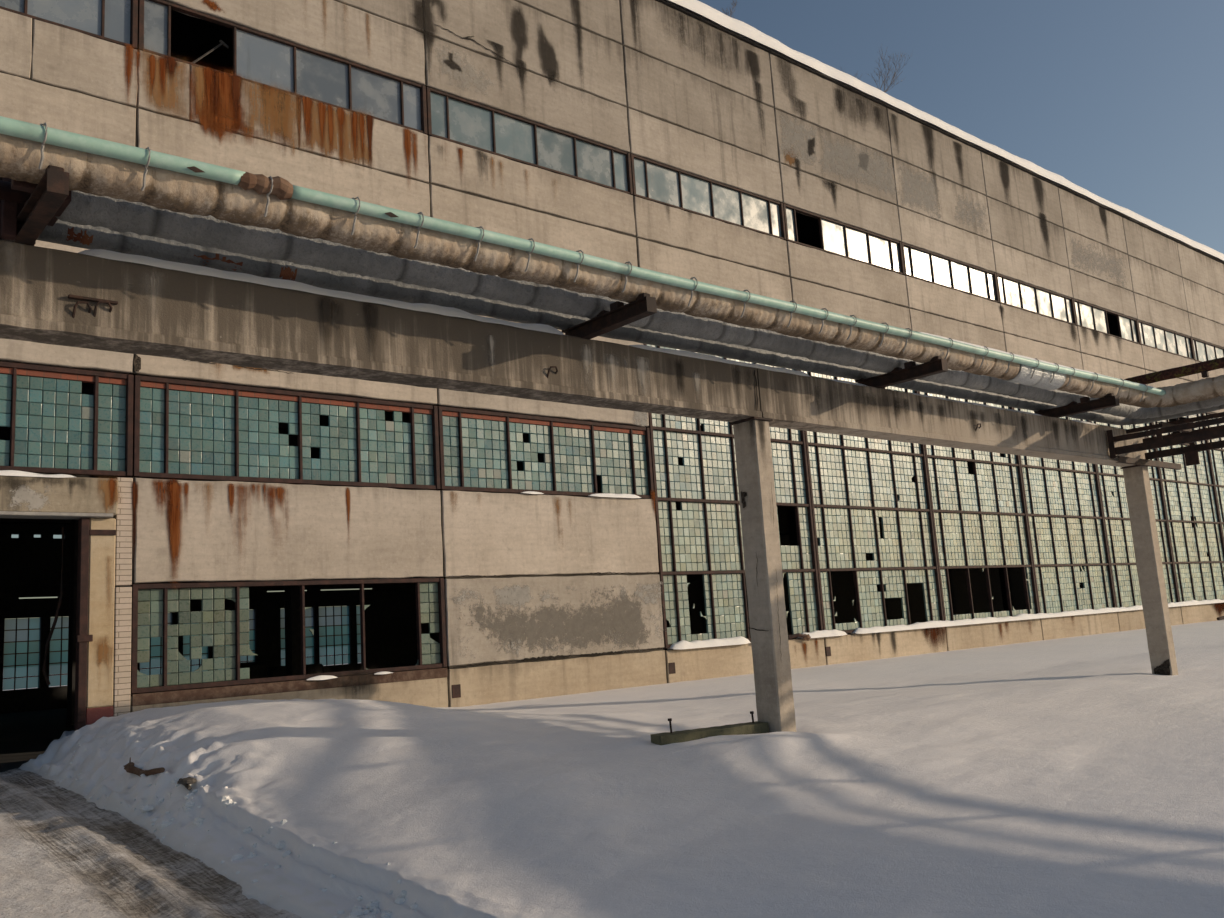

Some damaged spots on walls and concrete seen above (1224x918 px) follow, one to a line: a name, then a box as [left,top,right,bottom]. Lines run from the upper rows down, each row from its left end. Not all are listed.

water stain [414,0,444,58]
water stain [488,9,558,86]
rust [125,44,374,164]
water stain [836,86,898,137]
water stain [922,125,934,166]
water stain [954,142,963,175]
water stain [1000,161,1010,194]
water stain [1033,177,1049,248]
rust [99,478,138,539]
rust [155,479,189,565]
rust [228,483,284,512]
spalling [475,582,663,653]